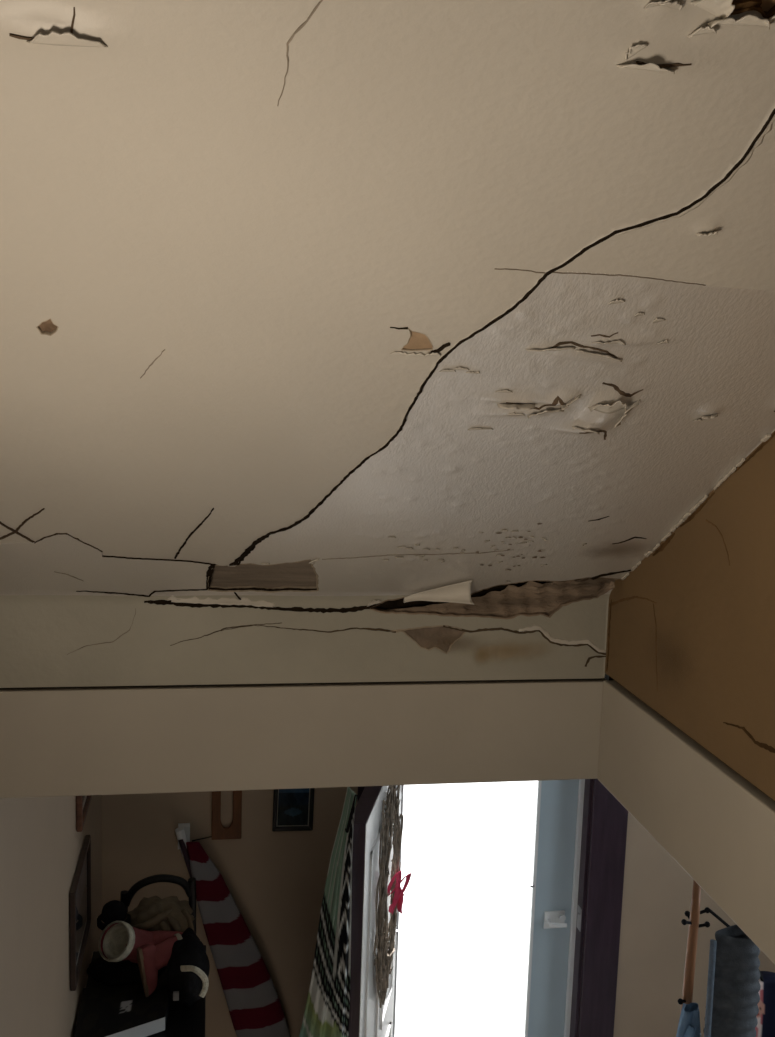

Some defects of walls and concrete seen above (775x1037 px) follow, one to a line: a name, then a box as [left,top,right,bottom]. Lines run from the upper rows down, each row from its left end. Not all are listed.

peeling [9,7,108,48]
spalling [644,0,775,38]
crack [277,0,323,106]
peeling [616,44,692,74]
spalling [36,318,59,336]
spalling [390,327,441,357]
crack [0,109,775,655]
spalling [367,458,745,654]
flaking render [207,558,320,593]